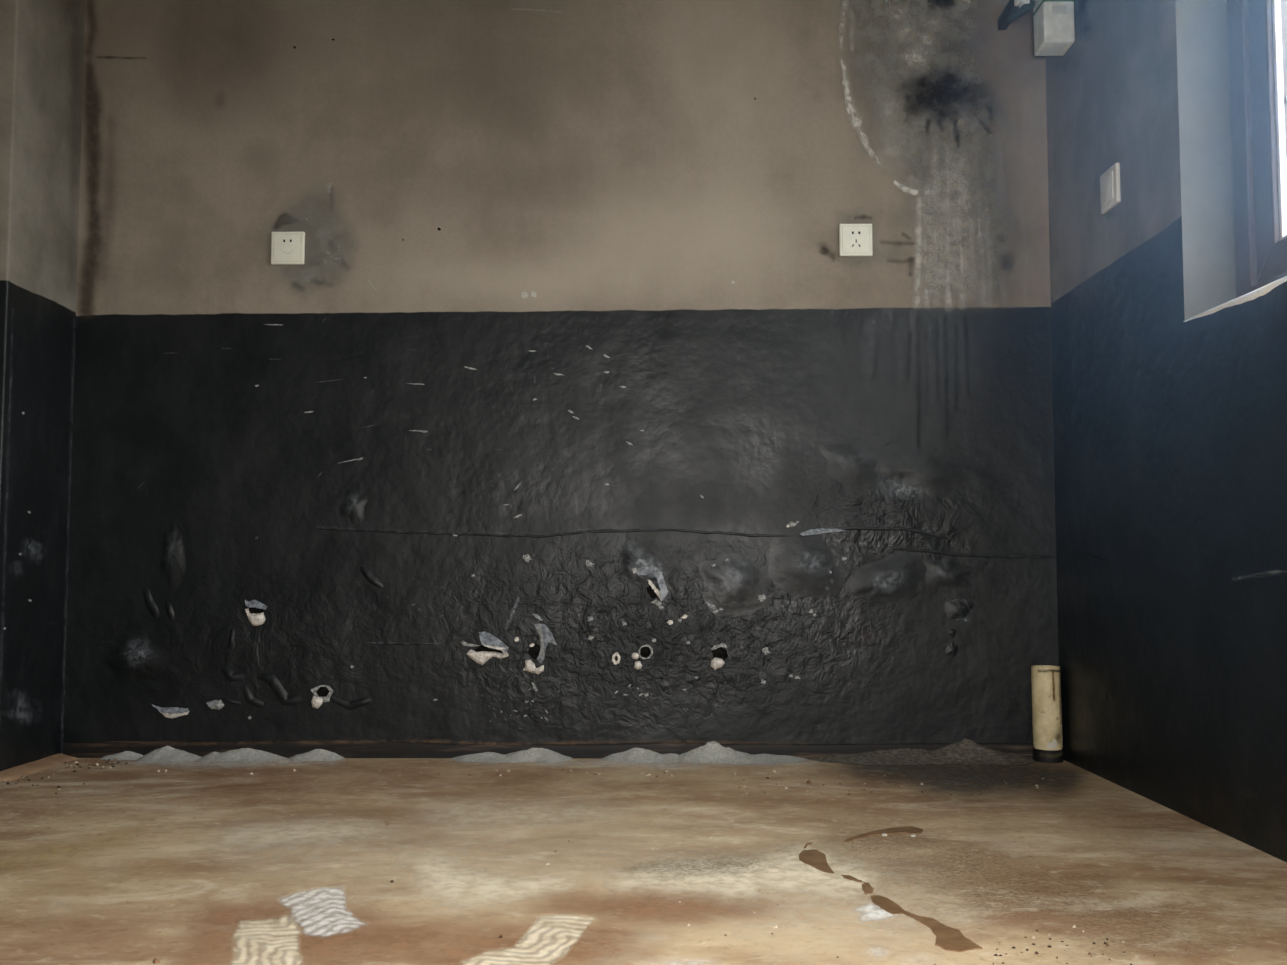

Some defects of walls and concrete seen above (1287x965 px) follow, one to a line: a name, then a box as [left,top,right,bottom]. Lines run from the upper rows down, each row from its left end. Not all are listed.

water stain [81,65,100,316]
water stain [914,164,969,441]
crack [317,528,795,538]
crack [833,526,1056,559]
peeling [245,600,267,626]
peeling [612,542,723,670]
peeling [711,643,731,670]
peeling [461,614,562,729]
peeling [152,704,189,718]
peeling [207,699,225,710]
peeling [311,685,333,709]
peeling [612,676,698,703]